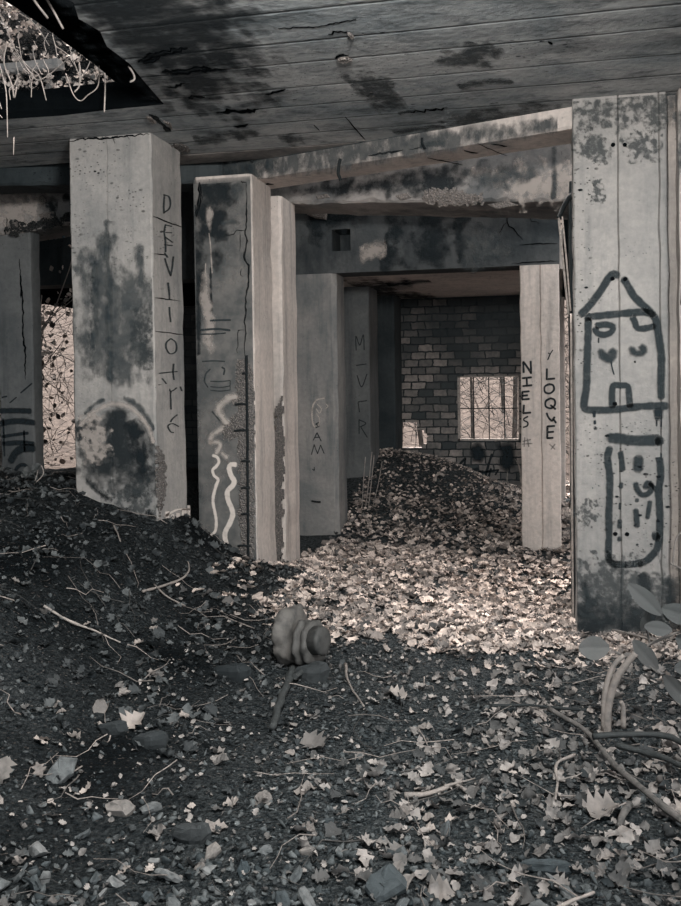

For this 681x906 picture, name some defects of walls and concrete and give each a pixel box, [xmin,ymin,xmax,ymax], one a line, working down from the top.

damp [57,0,268,116]
damp [344,72,414,115]
damp [436,41,502,67]
damp [458,79,513,89]
damp [573,93,677,133]
damp [193,102,572,355]
crack [18,259,26,376]
damp [73,220,153,385]
damp [75,407,156,500]